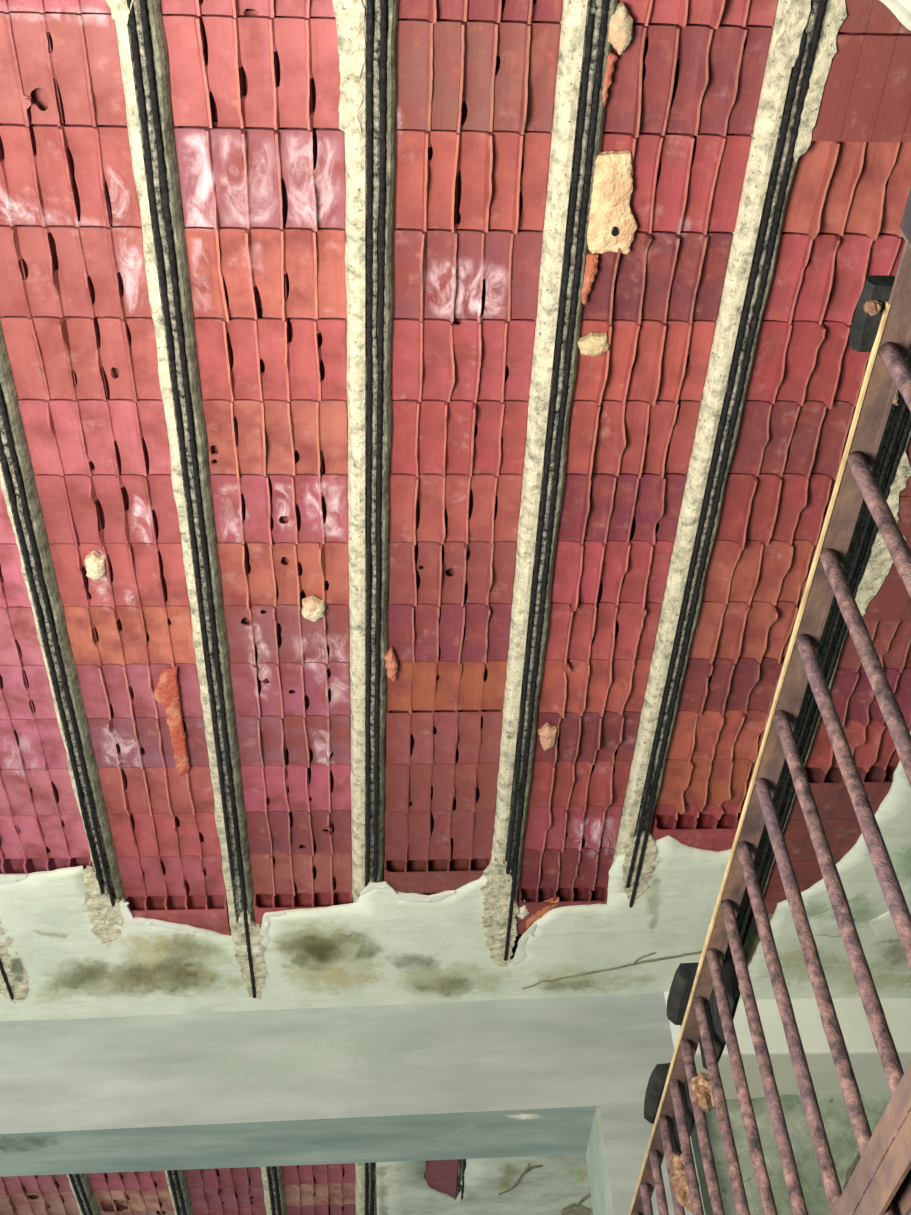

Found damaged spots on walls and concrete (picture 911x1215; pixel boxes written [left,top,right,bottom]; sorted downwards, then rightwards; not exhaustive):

damp [186,135,242,263]
damp [289,141,333,223]
damp [430,263,503,315]
spalling [105,0,286,999]
spalling [333,0,456,903]
spalling [480,0,611,967]
spalling [621,0,847,908]
spalling [842,498,893,616]
spalling [0,378,207,946]
damp [56,935,213,994]
damp [280,925,377,987]
damp [395,957,466,995]